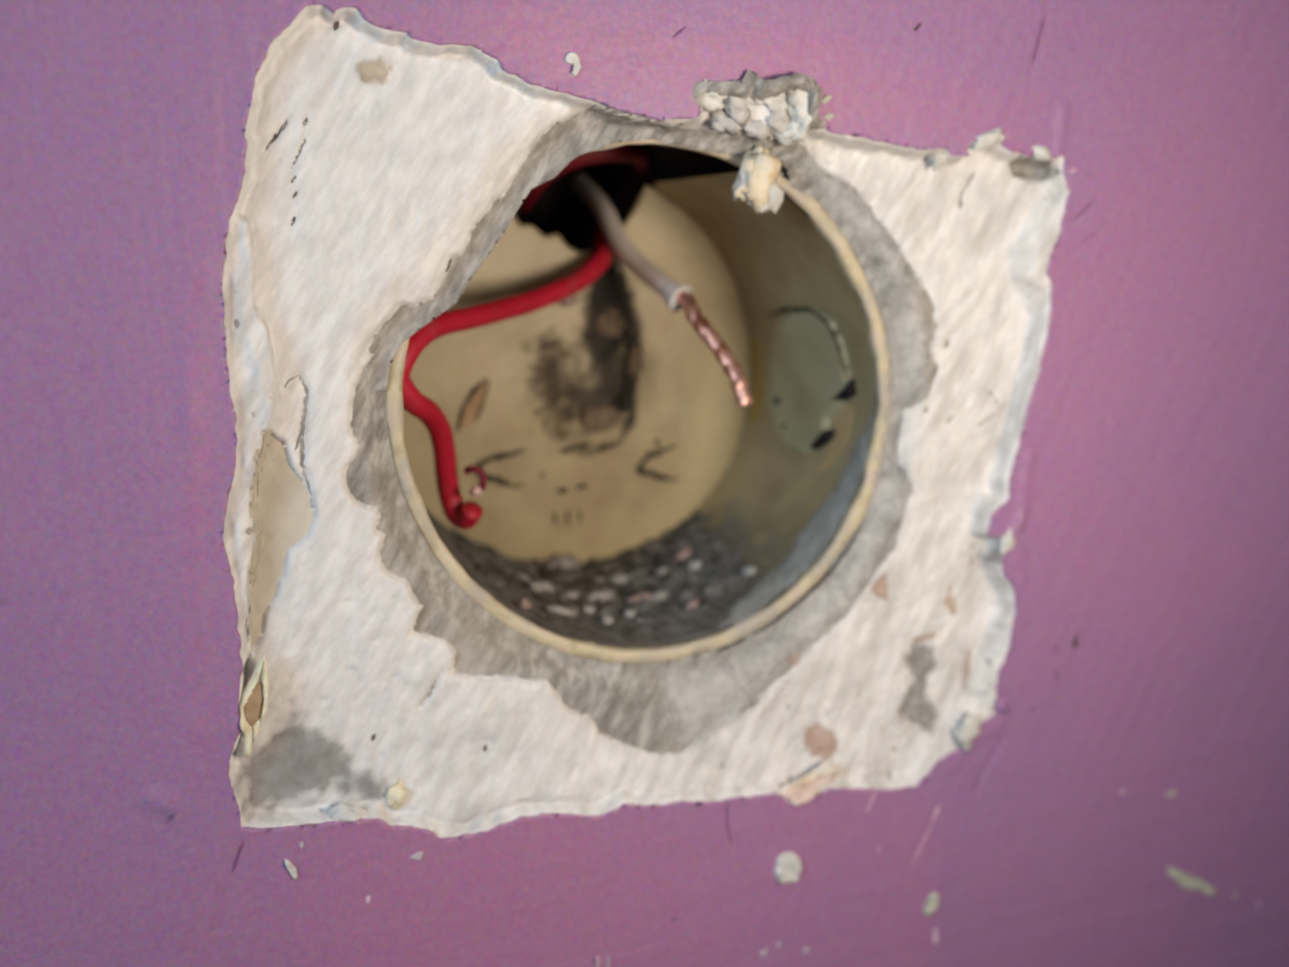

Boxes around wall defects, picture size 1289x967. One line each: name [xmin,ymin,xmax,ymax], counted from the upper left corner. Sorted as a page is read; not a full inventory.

spalling [222,5,1077,838]
peeling [284,859,298,879]